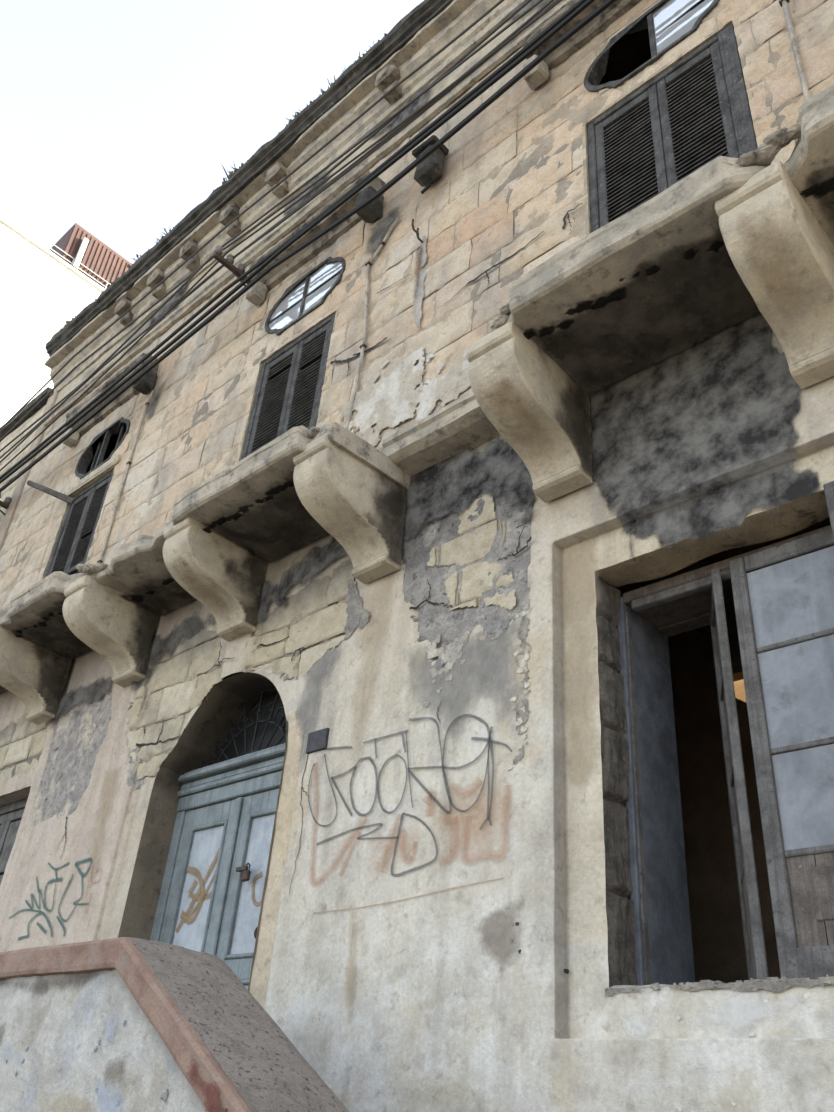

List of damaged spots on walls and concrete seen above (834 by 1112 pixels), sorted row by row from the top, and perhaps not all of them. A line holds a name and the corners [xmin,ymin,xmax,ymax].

flaking render [307,346,471,448]
flaking render [401,490,535,771]
flaking render [0,690,112,830]
water stain [482,908,521,960]